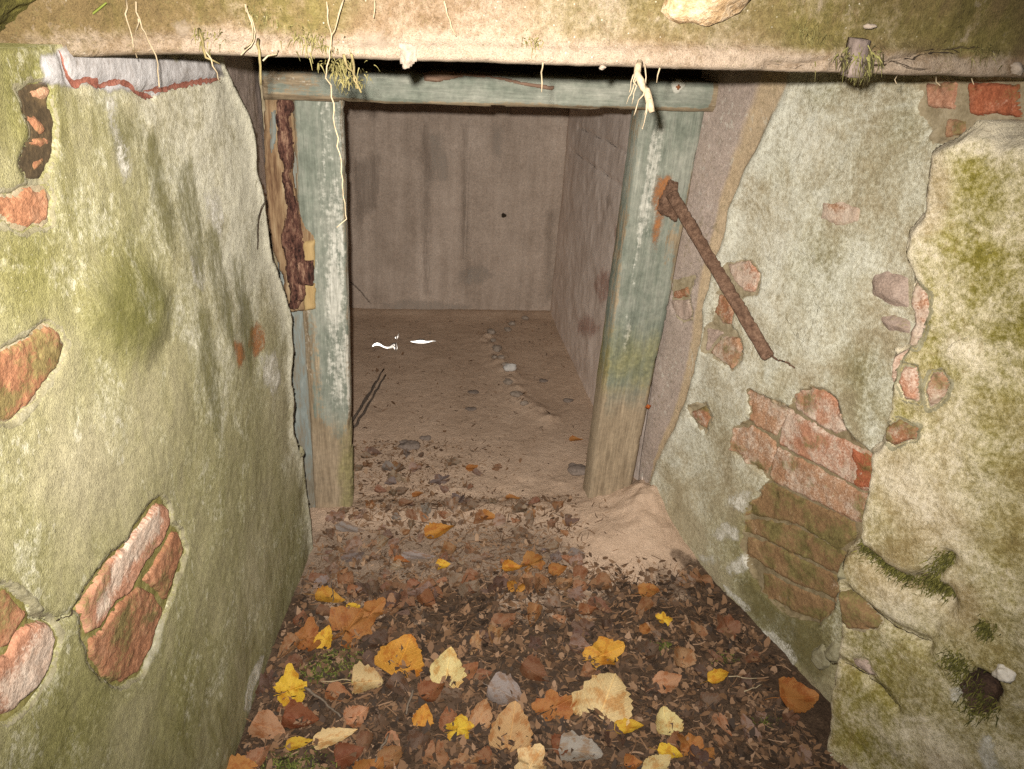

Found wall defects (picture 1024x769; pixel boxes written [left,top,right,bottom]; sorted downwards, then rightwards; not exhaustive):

spalling [0,76,60,238]
spalling [918,62,1024,144]
spalling [0,318,72,430]
rust [653,176,795,368]
spalling [700,259,761,372]
spalling [872,271,954,451]
spalling [728,385,885,633]
spalling [0,579,65,728]
spalling [72,494,189,691]